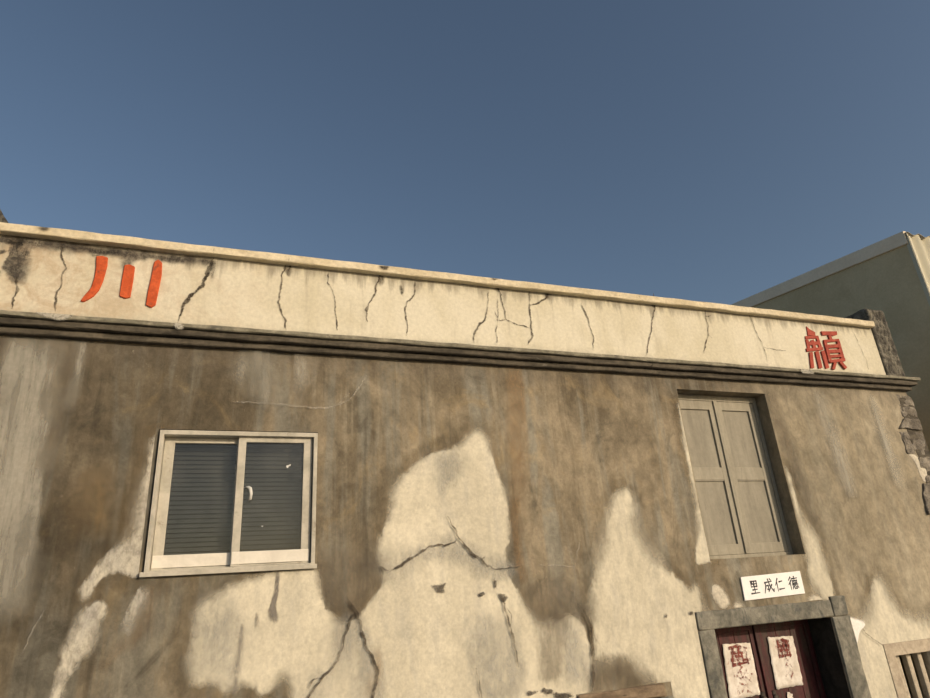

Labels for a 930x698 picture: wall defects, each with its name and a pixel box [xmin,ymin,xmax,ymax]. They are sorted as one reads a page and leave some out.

crack [54,241,67,306]
leakage [0,227,216,281]
crack [178,258,214,321]
crack [278,265,291,328]
crack [473,291,548,344]
leakage [0,342,52,595]
leakage [269,575,279,620]
crack [380,516,520,663]
crack [308,598,379,698]